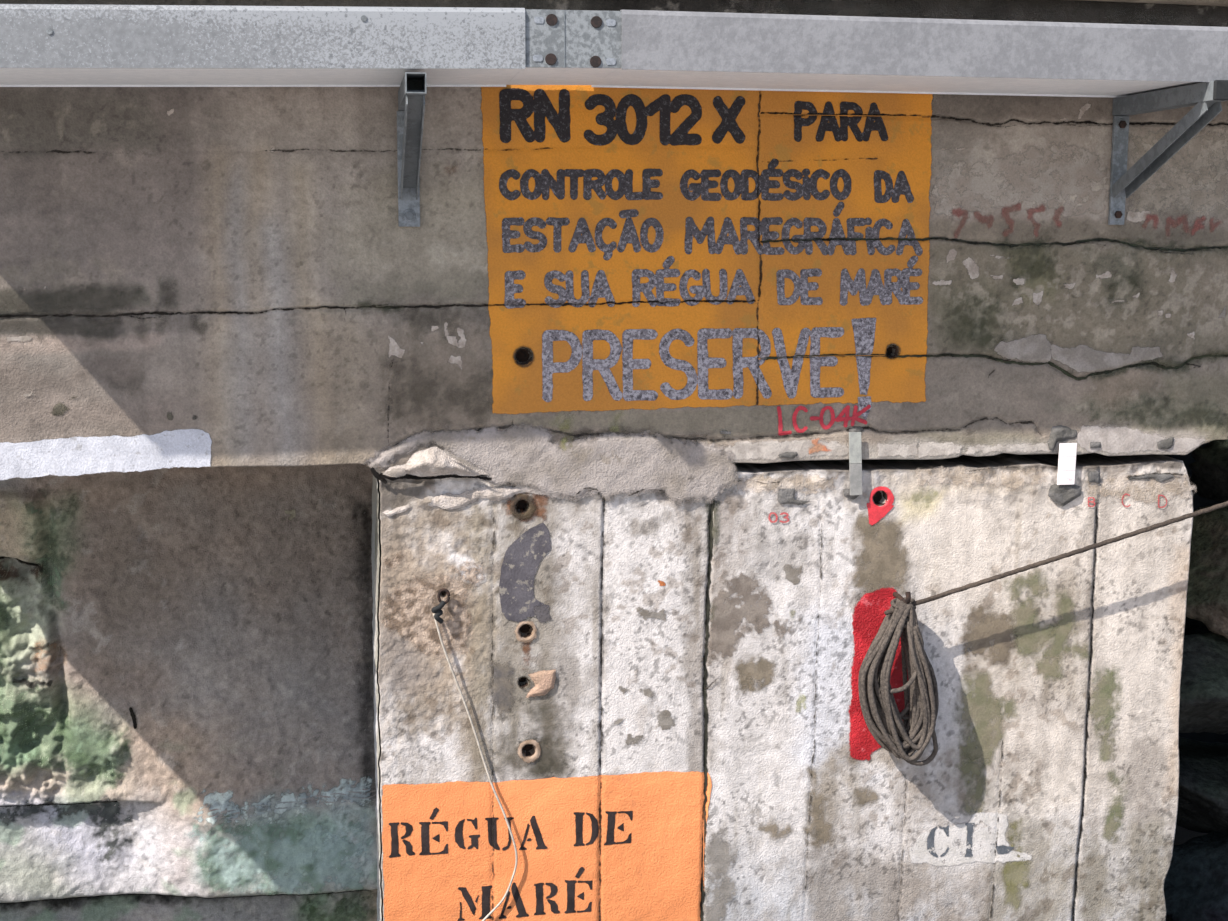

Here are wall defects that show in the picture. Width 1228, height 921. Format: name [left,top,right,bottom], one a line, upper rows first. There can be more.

crack [0,92,1228,405]
spalling [994,334,1163,373]
crack [366,406,1039,484]
spalling [383,446,544,510]
spalling [382,504,411,517]
rust [508,493,547,521]
leakage [963,606,1017,671]
leakage [1011,571,1088,678]
leakage [1004,700,1015,718]
leakage [960,758,985,813]
leakage [1104,797,1123,840]